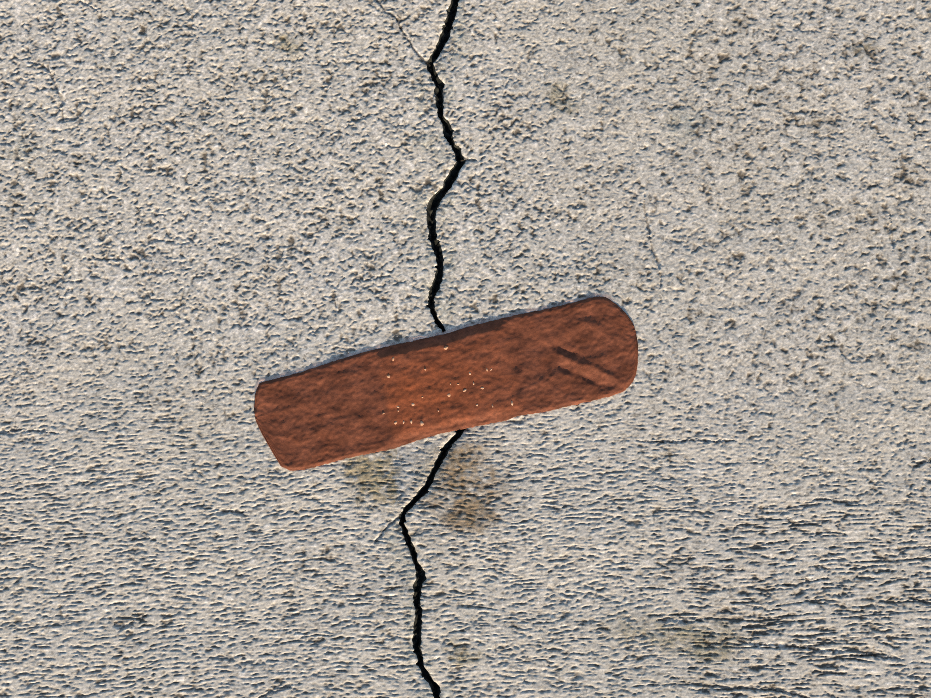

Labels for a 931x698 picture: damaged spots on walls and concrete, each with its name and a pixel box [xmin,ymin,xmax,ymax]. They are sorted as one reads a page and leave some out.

crack [377,0,466,333]
crack [388,429,465,698]